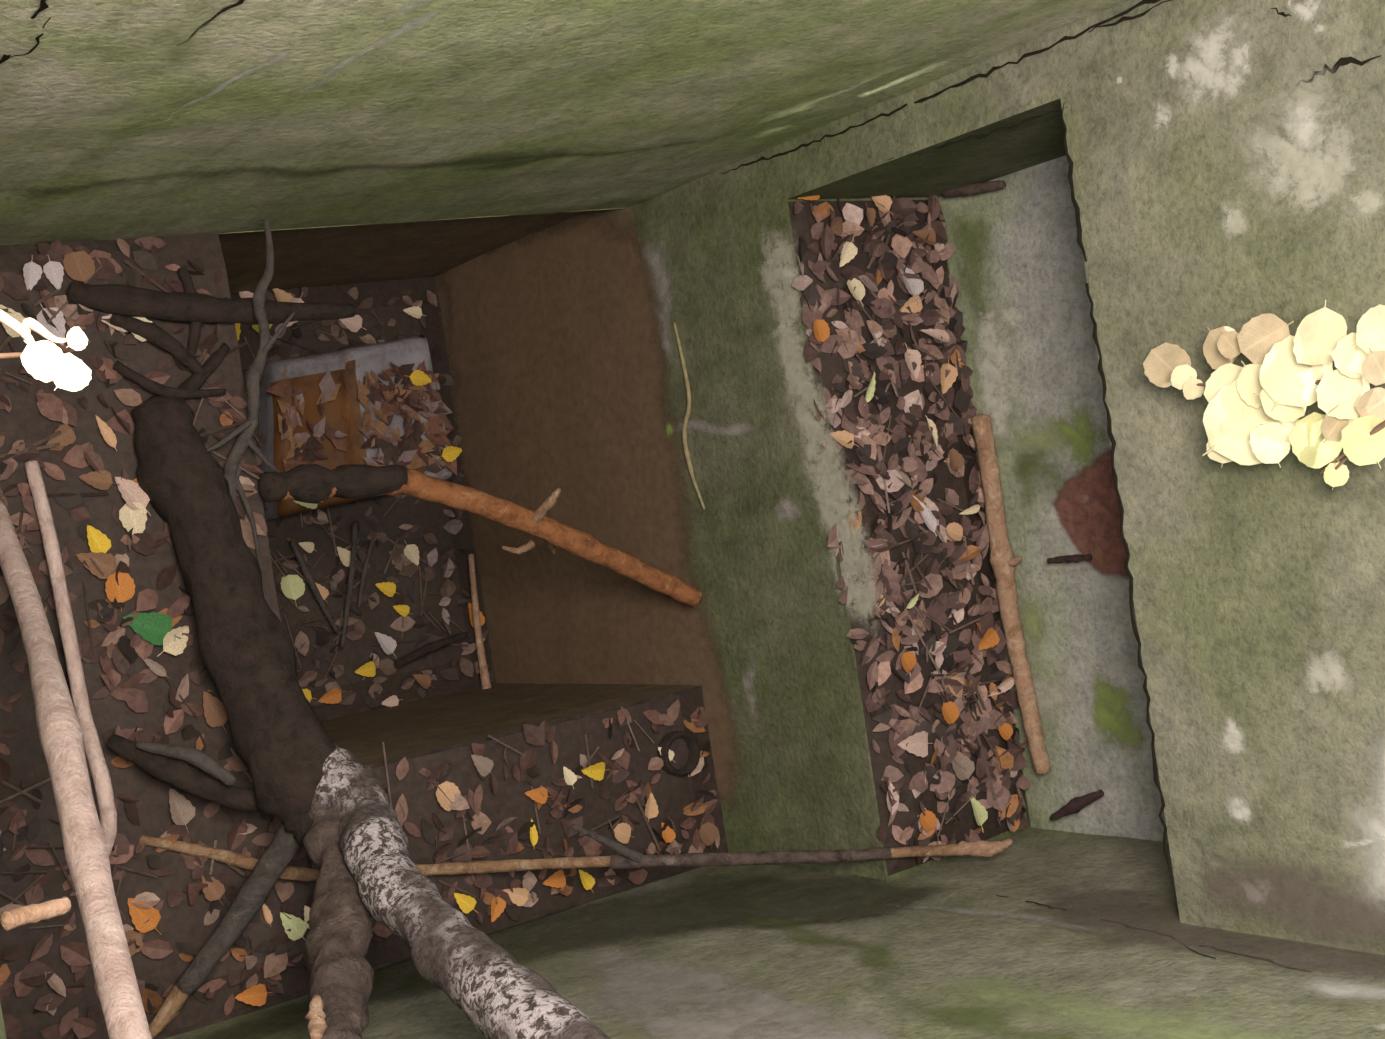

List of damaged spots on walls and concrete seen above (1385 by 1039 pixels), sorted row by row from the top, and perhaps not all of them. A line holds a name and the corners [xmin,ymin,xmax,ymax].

crack [0,0,51,64]
crack [177,0,244,46]
crack [720,0,1171,174]
crack [1297,55,1382,86]